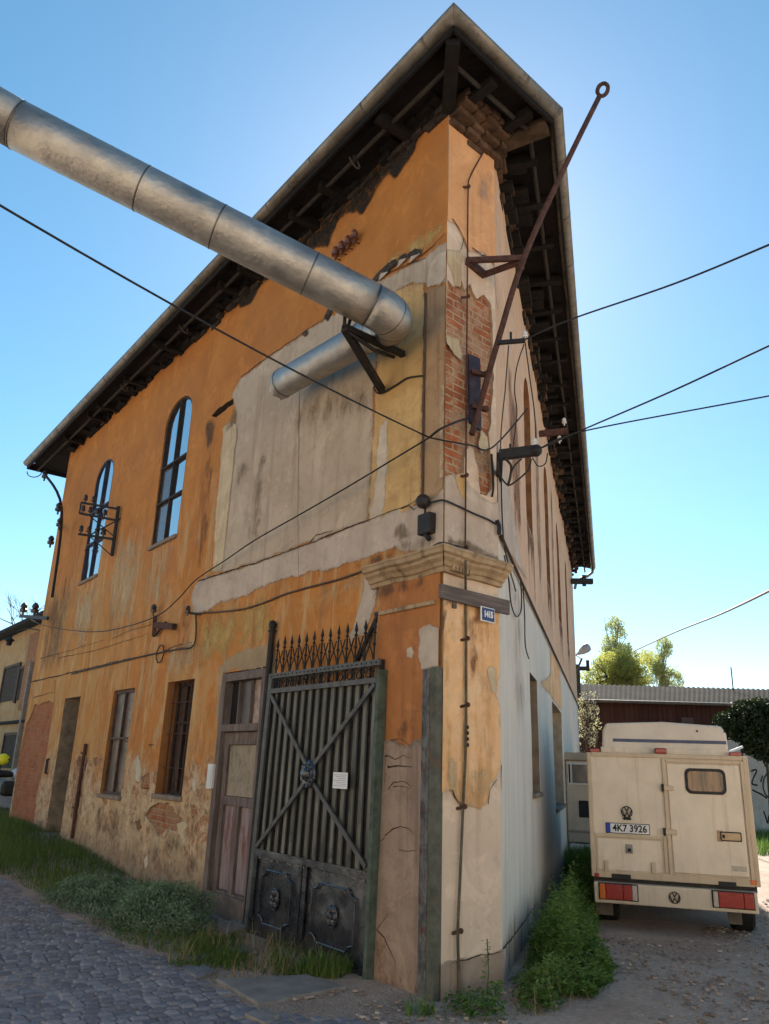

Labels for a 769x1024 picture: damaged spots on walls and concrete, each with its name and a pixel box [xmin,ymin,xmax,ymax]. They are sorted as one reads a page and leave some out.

spalling [212,399,234,417]
flaking render [439,280,494,499]
flaking render [11,701,53,825]
crack [384,738,412,790]
flaking render [135,803,198,847]